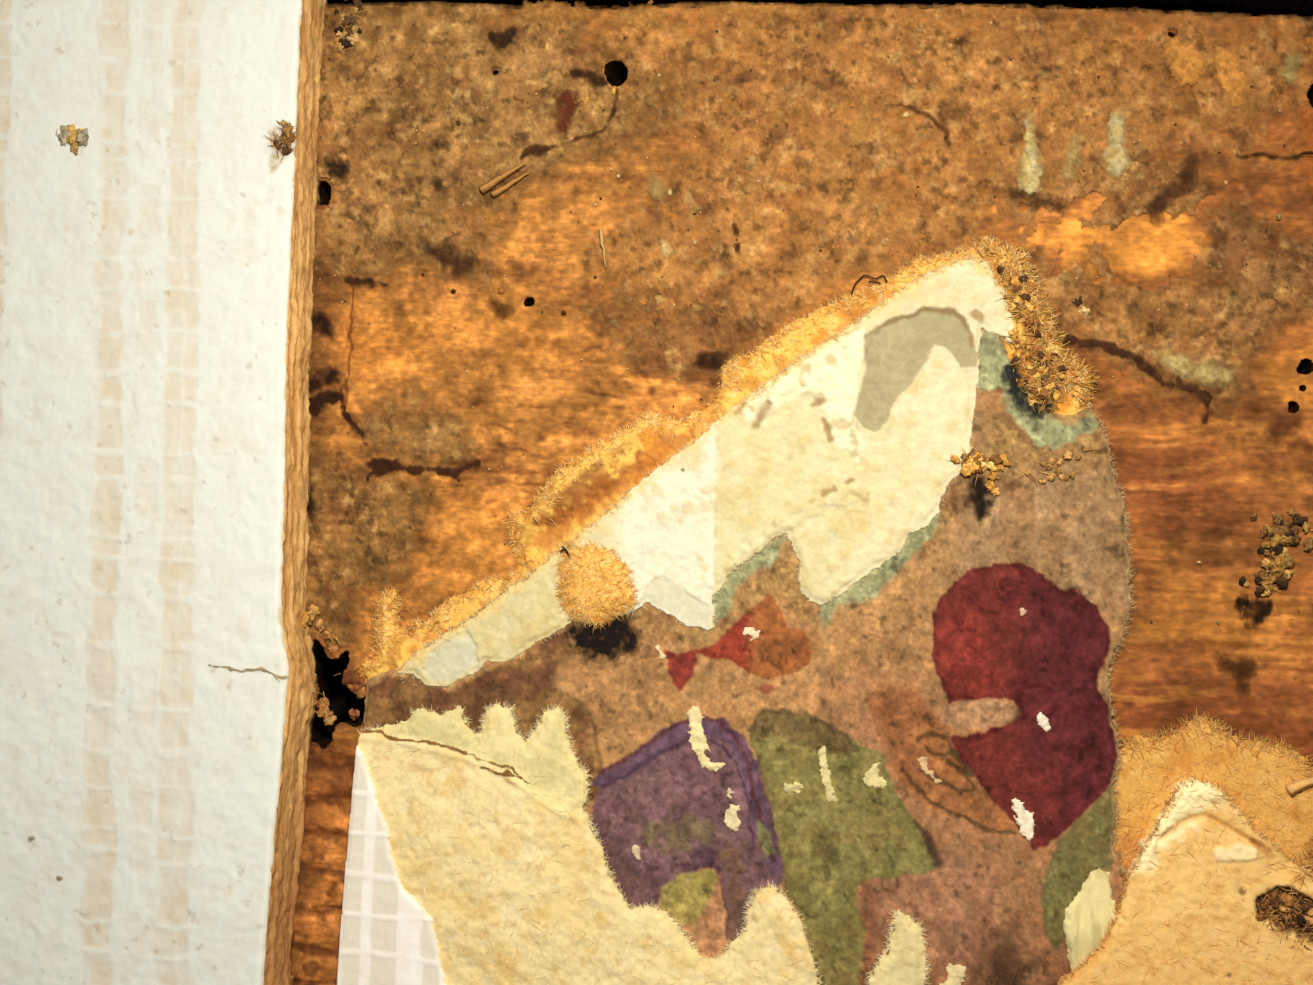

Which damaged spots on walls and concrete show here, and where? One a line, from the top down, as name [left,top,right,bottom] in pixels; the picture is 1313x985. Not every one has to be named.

peeling [395,254,1017,687]
water stain [1235,595,1273,627]
crack [209,664,288,682]